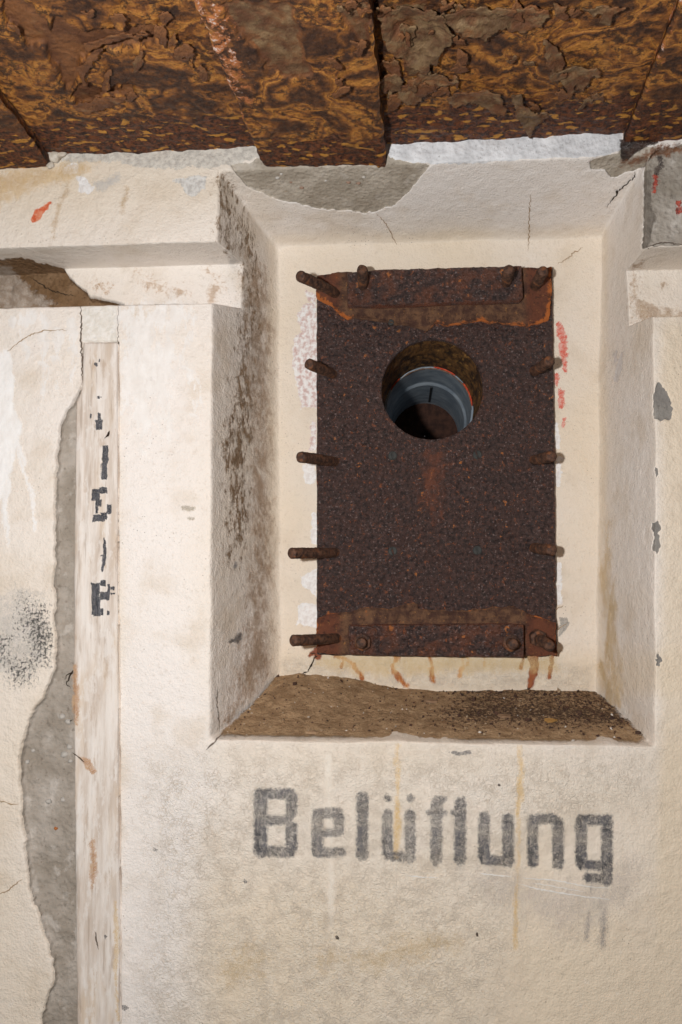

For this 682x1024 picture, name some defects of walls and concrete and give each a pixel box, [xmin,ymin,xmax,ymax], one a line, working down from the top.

corrosion [583,5,626,26]
corrosion [337,0,569,139]
corrosion [619,139,682,168]
flaking render [231,154,429,213]
flaking render [590,144,682,249]
peeling [653,382,673,421]
leakage [202,172,280,725]
peeling [651,521,661,554]
leakage [0,574,54,692]
corrosion [308,647,559,690]
flaking render [20,390,82,1024]